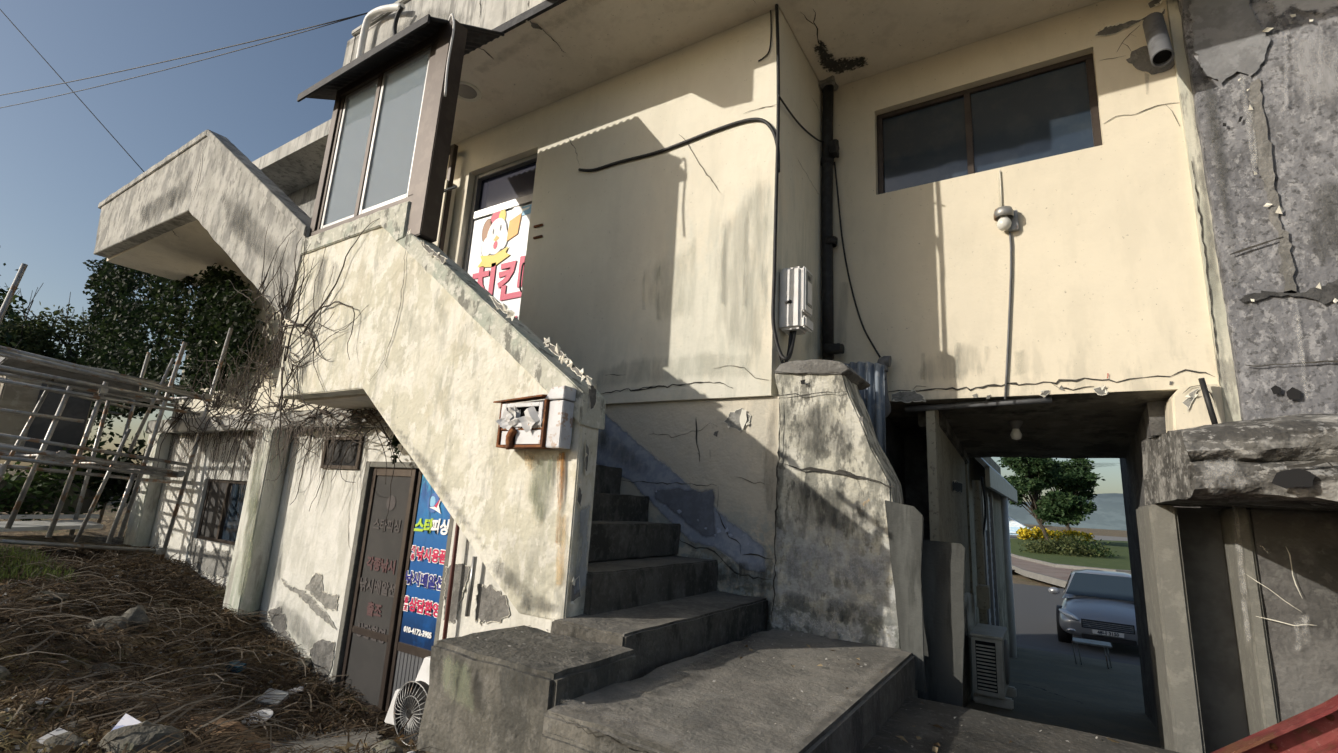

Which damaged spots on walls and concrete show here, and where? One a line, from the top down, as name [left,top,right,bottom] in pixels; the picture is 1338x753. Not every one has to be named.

peeling [1262,0,1338,32]
crack [889,161,1338,407]
flaking render [1239,279,1338,305]
flaking render [713,408,751,437]
crack [600,365,893,619]
peeling [267,606,294,646]
peeling [281,572,338,680]